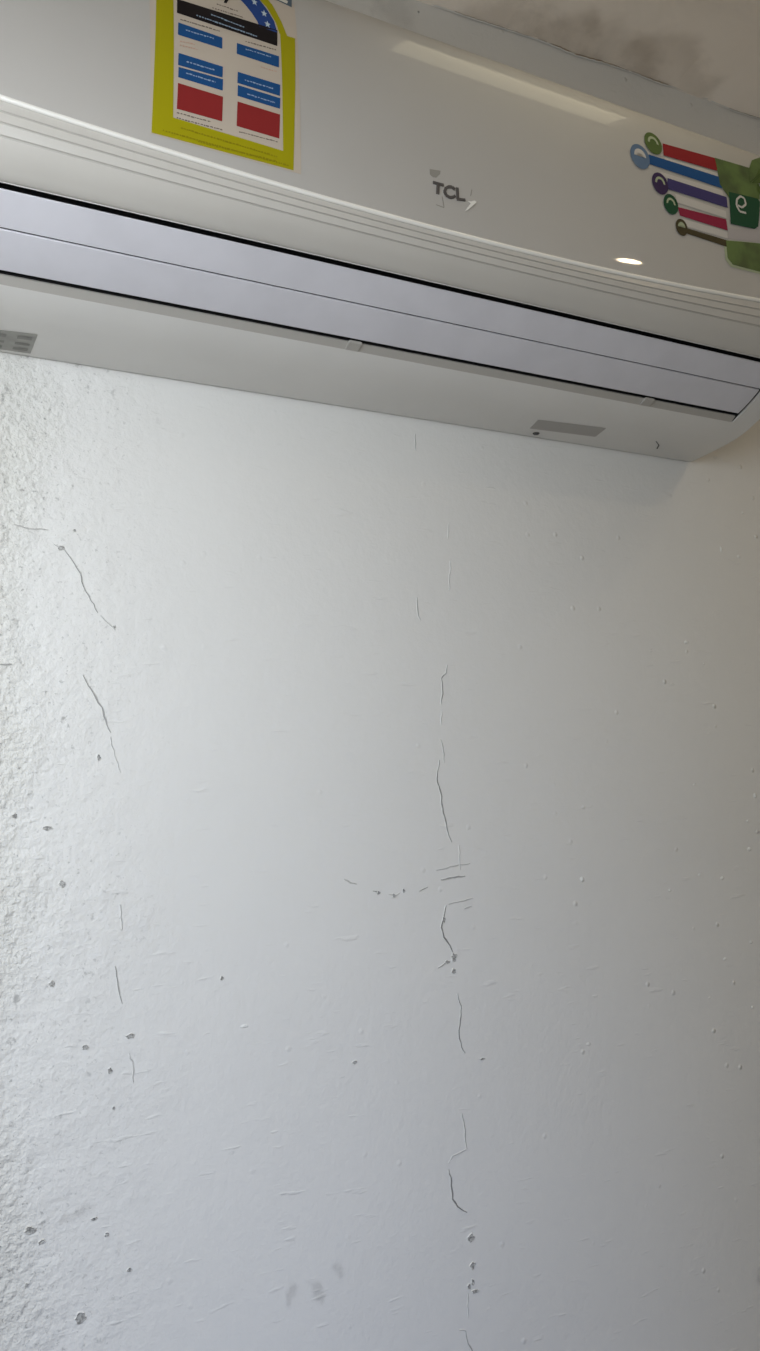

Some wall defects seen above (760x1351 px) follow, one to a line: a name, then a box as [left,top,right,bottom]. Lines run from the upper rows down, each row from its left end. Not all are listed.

crack [83,675,121,773]
crack [344,665,473,1054]
crack [448,1113,479,1351]